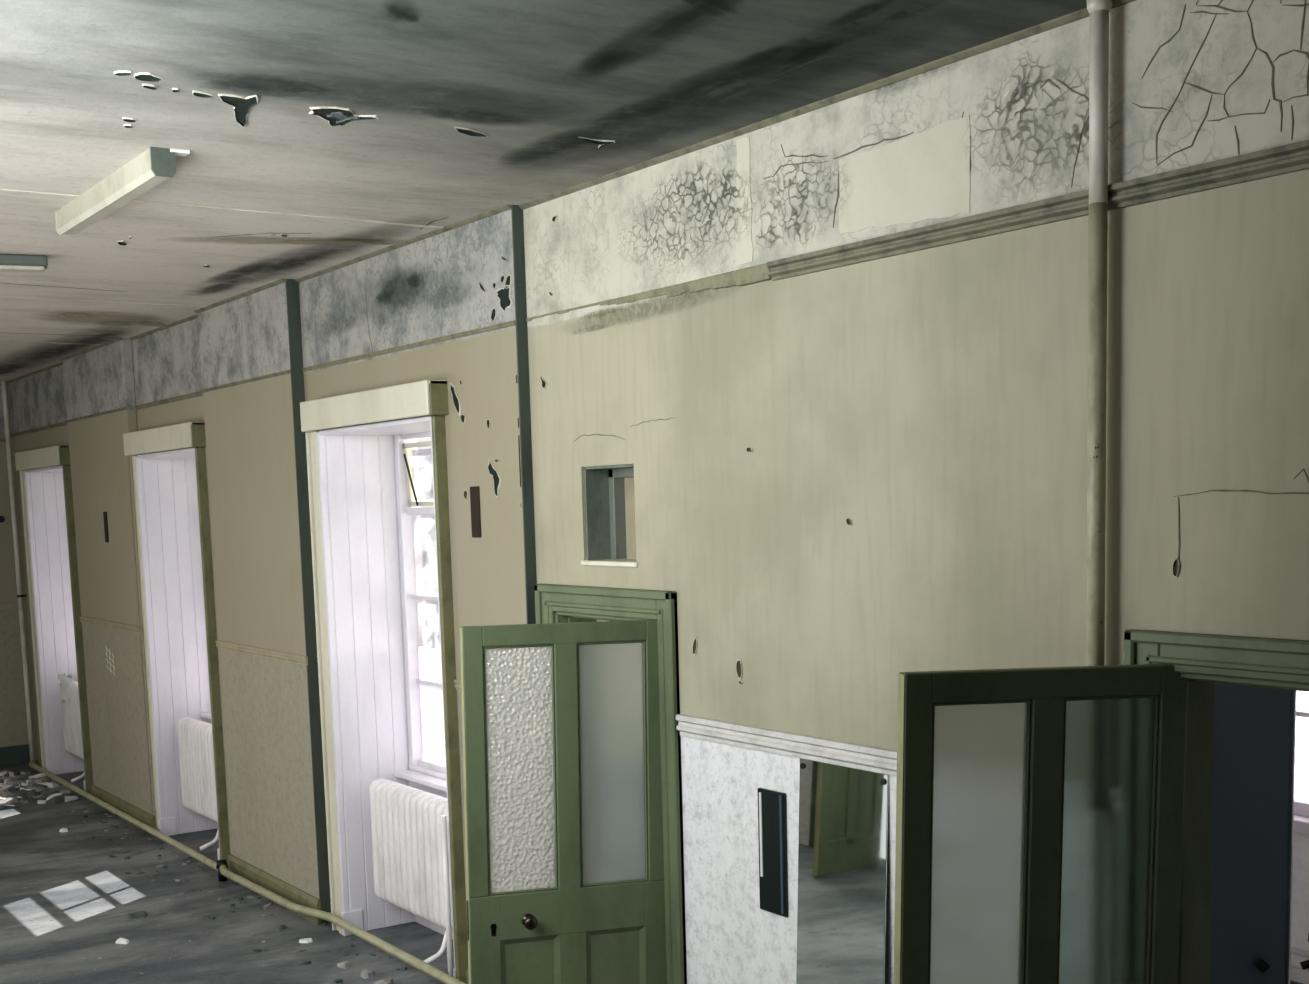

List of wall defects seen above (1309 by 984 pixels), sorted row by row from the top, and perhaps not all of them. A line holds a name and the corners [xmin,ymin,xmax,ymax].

peeling [114,71,214,98]
crack [1133,0,1309,166]
crack [962,65,1111,188]
crack [646,174,731,252]
crack [759,132,914,244]
flaking render [479,256,513,322]
flaking render [450,379,466,423]
flaking render [487,459,501,500]
crack [1173,469,1309,573]